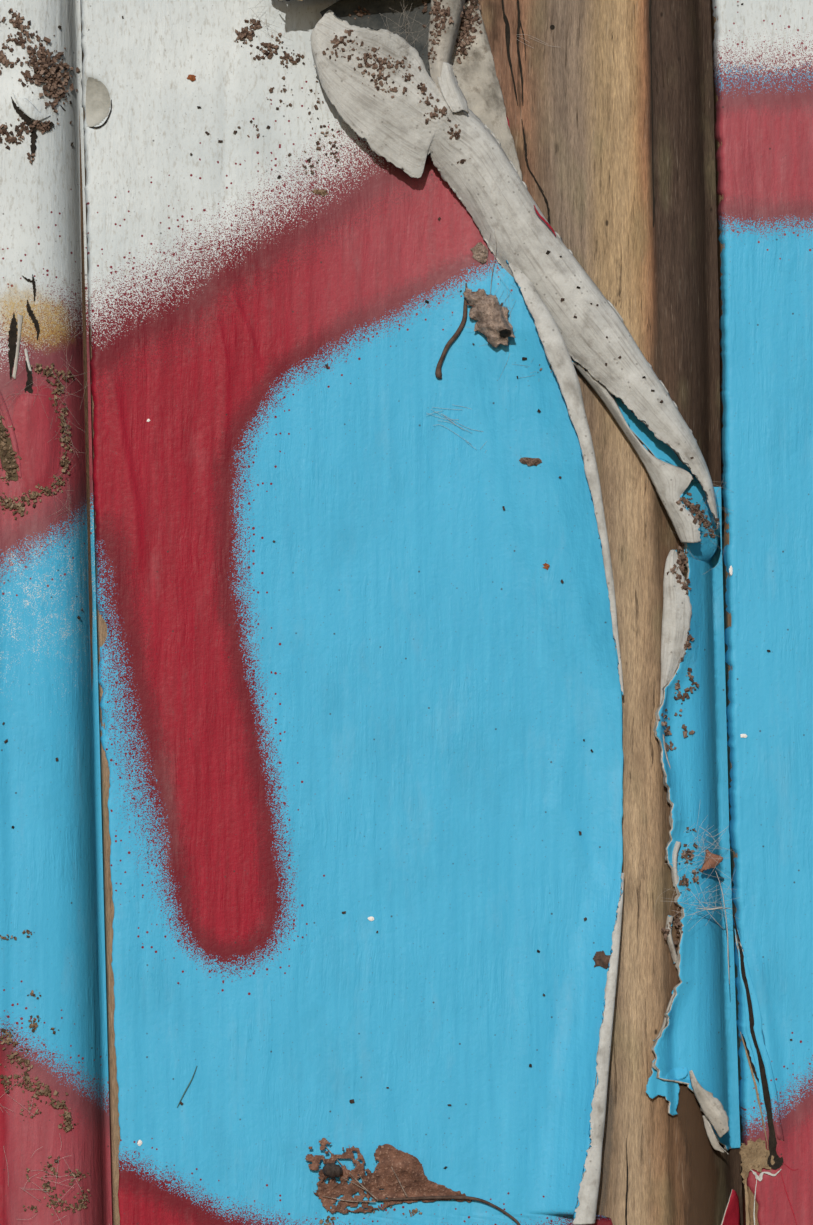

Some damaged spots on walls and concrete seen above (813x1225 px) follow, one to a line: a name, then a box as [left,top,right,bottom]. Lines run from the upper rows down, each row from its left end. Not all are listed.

crack [501,0,550,224]
peeling [311,0,783,1225]